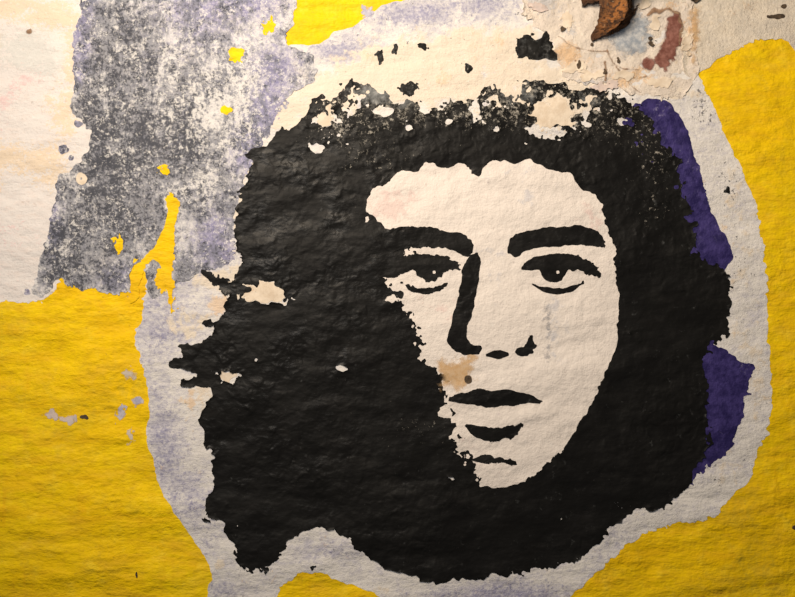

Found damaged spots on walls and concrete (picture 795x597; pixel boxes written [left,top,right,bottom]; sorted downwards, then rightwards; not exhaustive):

spalling [521,0,795,101]
corrosion [642,7,699,72]
peeling [317,104,334,127]
peeling [528,97,577,136]
peeling [45,408,88,426]
peeling [115,396,144,424]